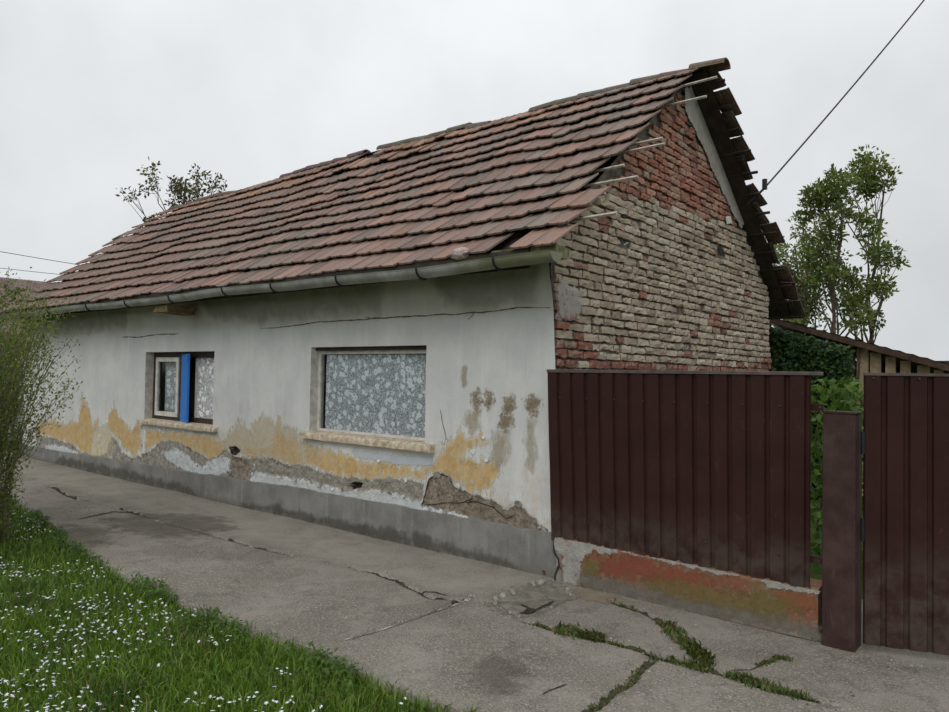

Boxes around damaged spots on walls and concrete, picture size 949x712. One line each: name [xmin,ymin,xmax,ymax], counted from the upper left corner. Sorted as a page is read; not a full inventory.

crack [260,307,550,329]
damp [462,367,540,468]
crack [49,487,293,556]
spalling [34,393,638,618]
crack [345,569,472,640]
crack [519,542,820,712]
spalling [650,557,741,577]
spalling [761,579,821,595]